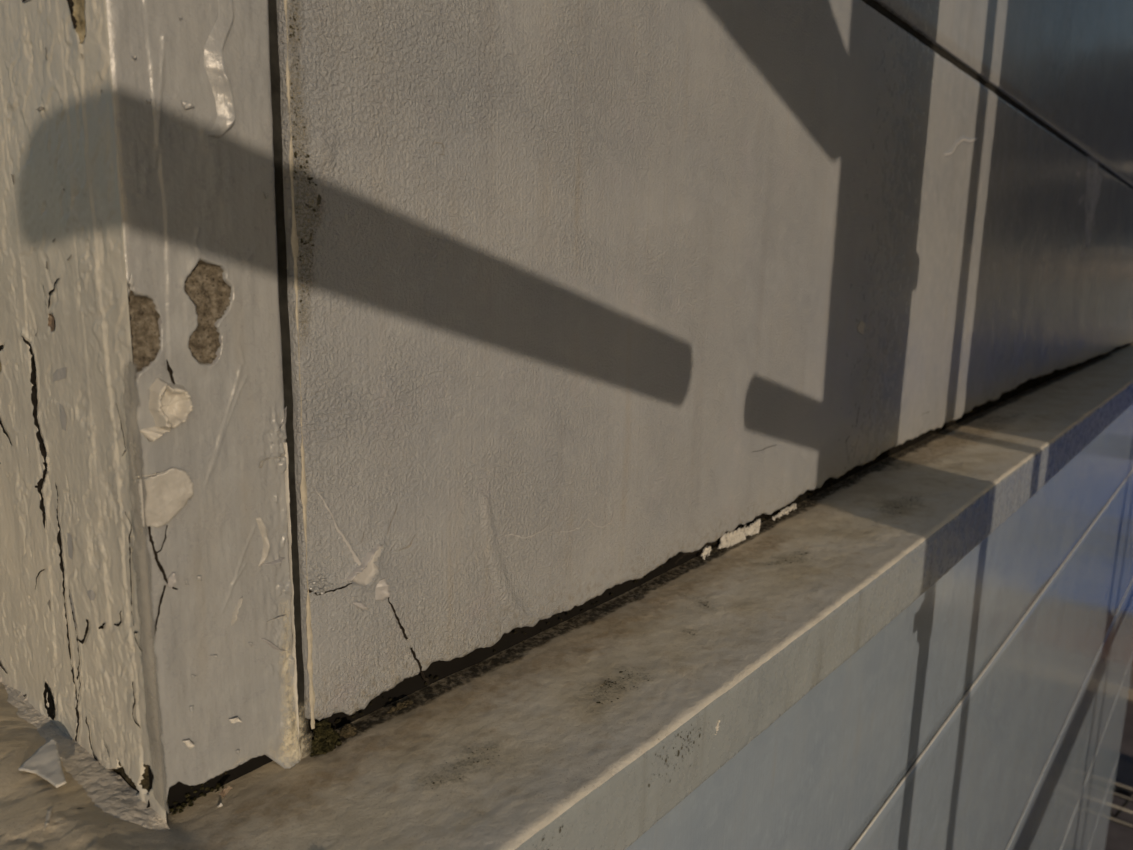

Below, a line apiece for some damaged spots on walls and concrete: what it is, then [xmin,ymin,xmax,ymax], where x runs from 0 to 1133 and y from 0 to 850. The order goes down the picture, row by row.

peeling [67,0,86,58]
peeling [204,0,236,138]
spalling [128,283,162,379]
spalling [185,260,231,365]
crack [0,336,178,761]
peeling [134,467,194,528]
peeling [346,544,390,610]
peeling [701,503,797,560]
crack [388,597,430,685]
spalling [43,682,55,720]